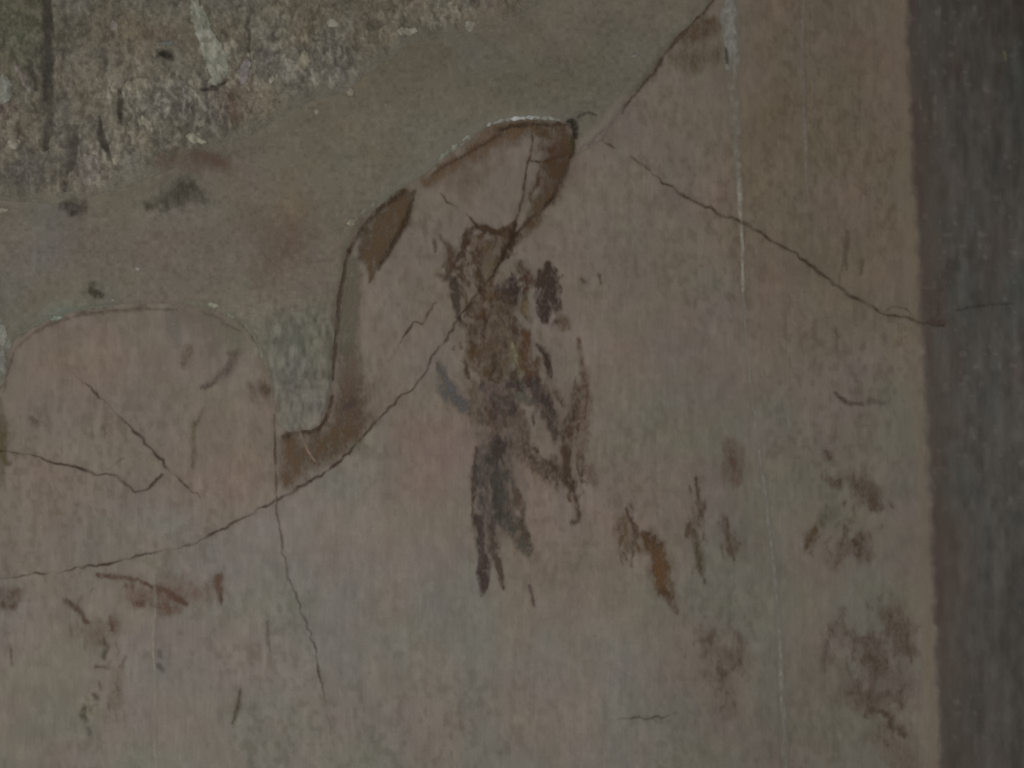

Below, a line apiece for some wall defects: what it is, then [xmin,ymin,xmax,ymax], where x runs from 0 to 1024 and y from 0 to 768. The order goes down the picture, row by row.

spalling [0,0,548,213]
crack [661,182,827,278]
crack [35,456,86,471]
crack [131,429,187,493]
crack [262,395,401,508]
corrosion [618,509,672,599]